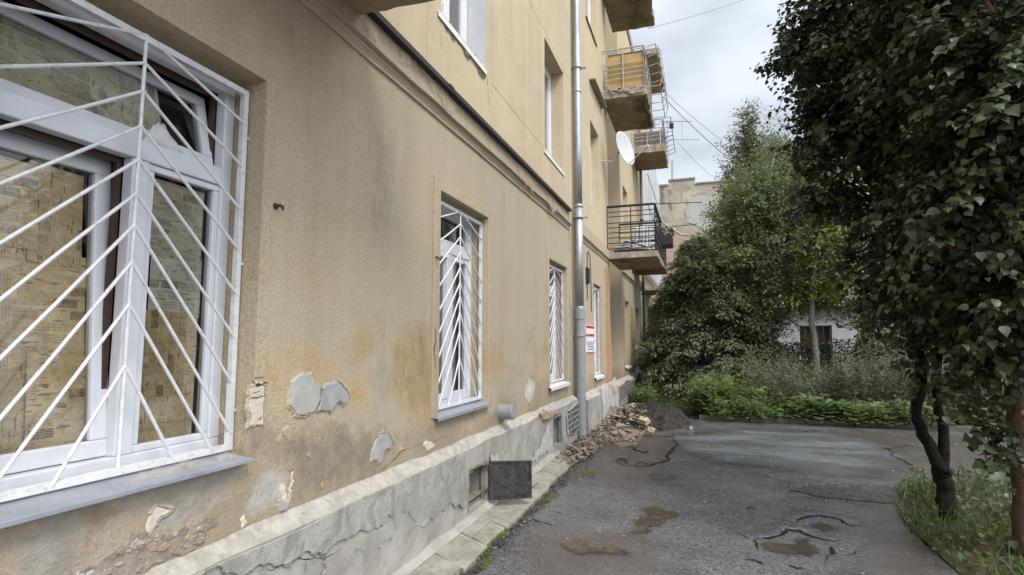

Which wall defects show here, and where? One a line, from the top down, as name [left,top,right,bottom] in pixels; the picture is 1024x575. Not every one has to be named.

flaking render [244,381,268,429]
peeling [524,376,535,404]
flaking render [65,503,219,575]